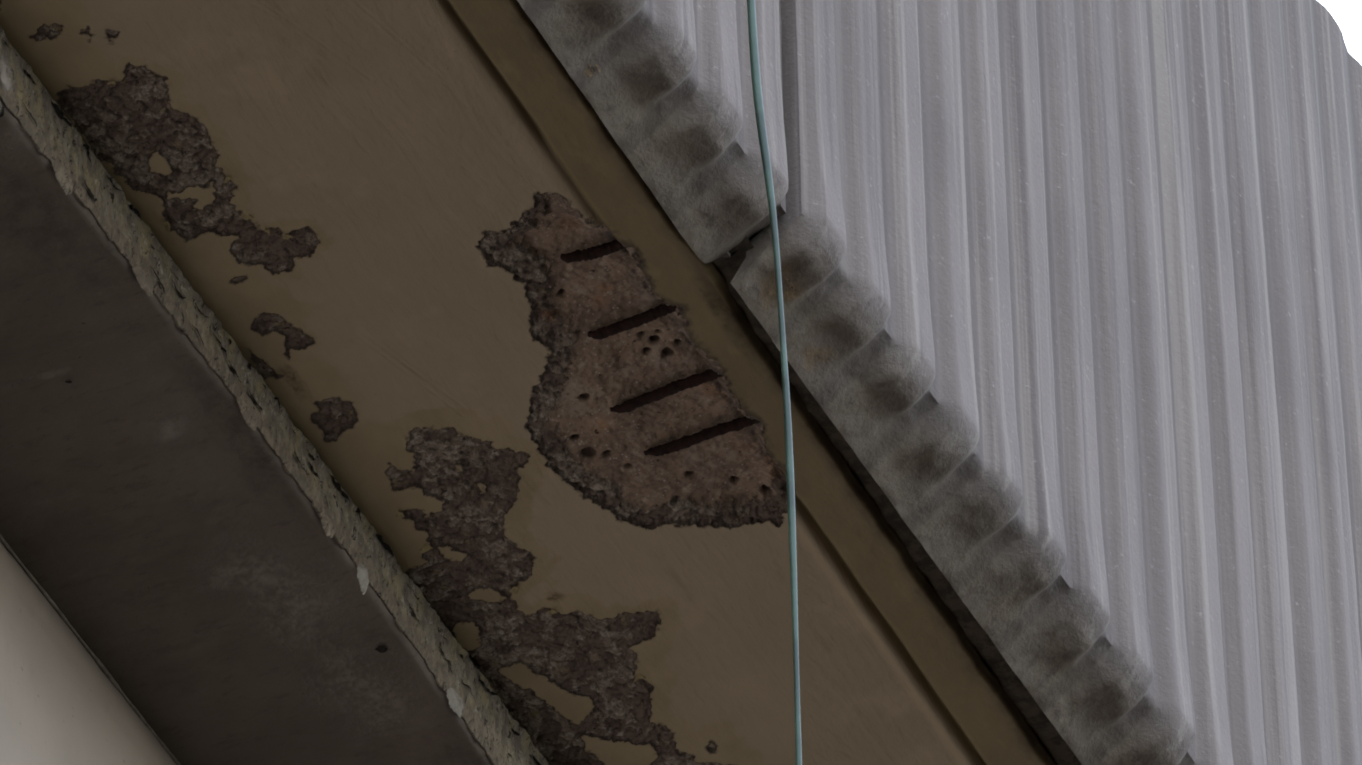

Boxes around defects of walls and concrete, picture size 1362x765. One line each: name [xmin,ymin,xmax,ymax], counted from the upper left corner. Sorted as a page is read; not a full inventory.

peeling [29,23,63,41]
spalling [0,26,788,765]